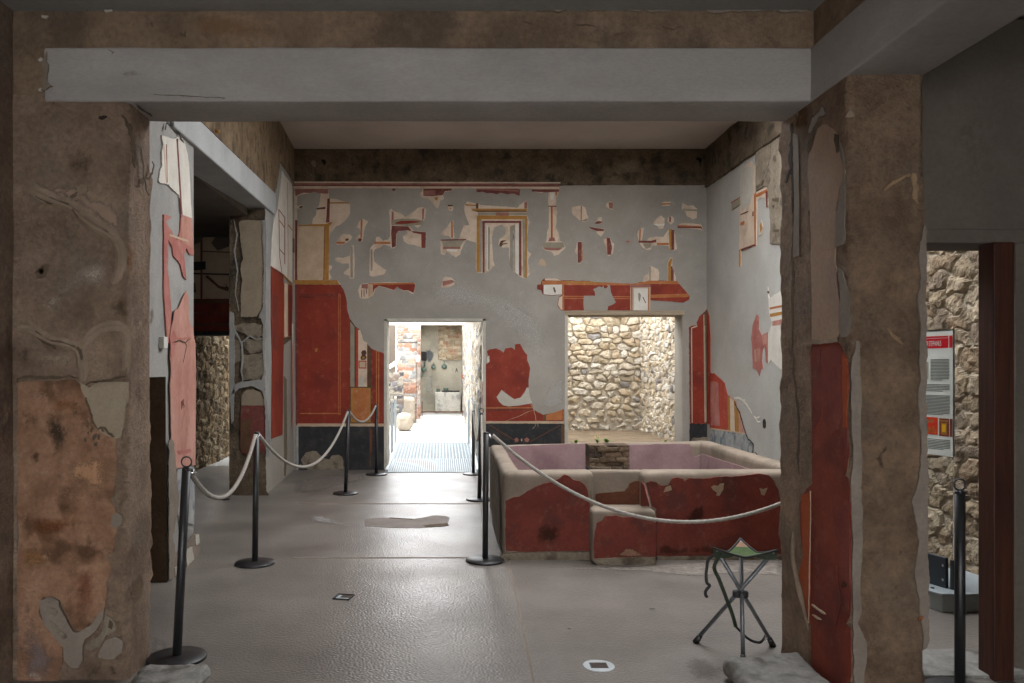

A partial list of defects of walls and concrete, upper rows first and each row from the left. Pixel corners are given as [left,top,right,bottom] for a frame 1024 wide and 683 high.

flaking render [755,136,782,244]
flaking render [583,285,616,311]
flaking render [229,209,269,496]
flaking render [497,388,532,406]